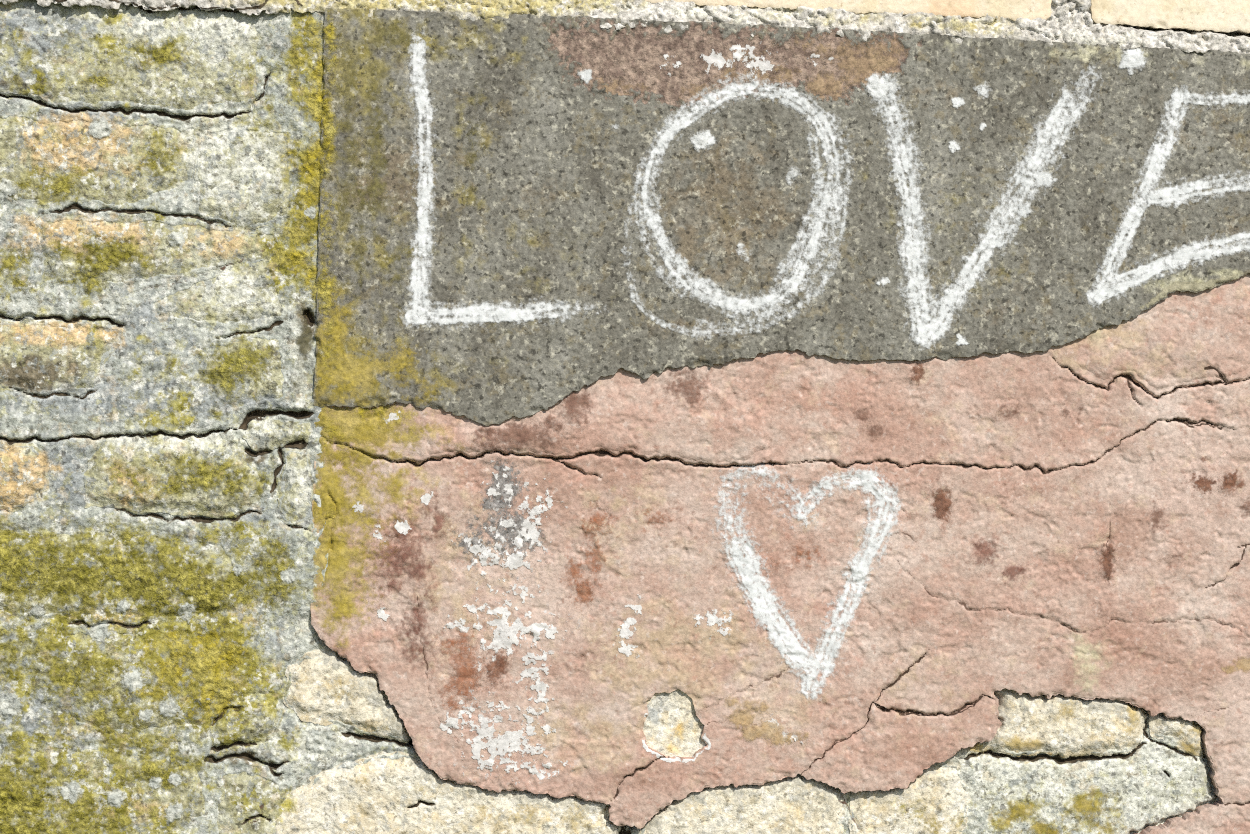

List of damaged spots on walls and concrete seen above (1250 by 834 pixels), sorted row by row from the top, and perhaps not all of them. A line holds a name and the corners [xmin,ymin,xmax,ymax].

spalling [543,18,922,110]
crack [0,315,124,327]
crack [216,309,315,339]
crack [0,357,1250,531]
leakage [440,577,568,783]
crack [875,649,985,716]
crack [341,732,413,747]
spalling [642,689,711,763]
peeling [728,697,809,745]
spalling [923,689,1139,775]
crack [959,717,1197,777]
spalling [626,773,910,832]